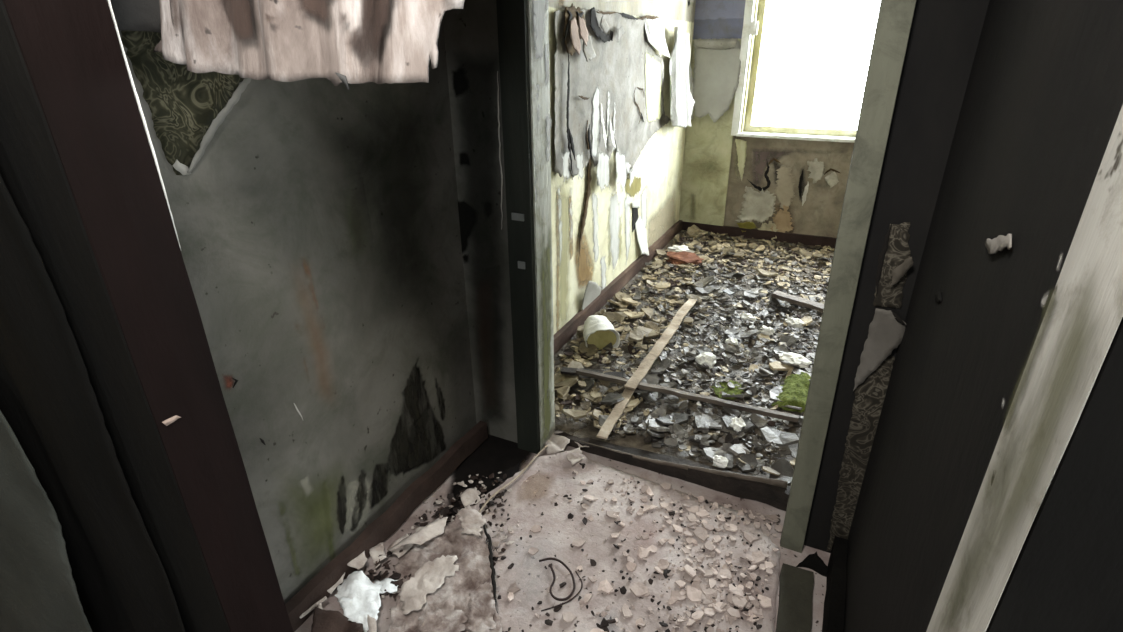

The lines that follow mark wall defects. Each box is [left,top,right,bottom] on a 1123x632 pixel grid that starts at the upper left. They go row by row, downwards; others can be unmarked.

peeling [533,0,549,97]
flaking render [563,3,626,62]
peeling [644,19,670,122]
peeling [534,87,649,310]
peeling [735,139,839,242]
damp [325,360,446,558]